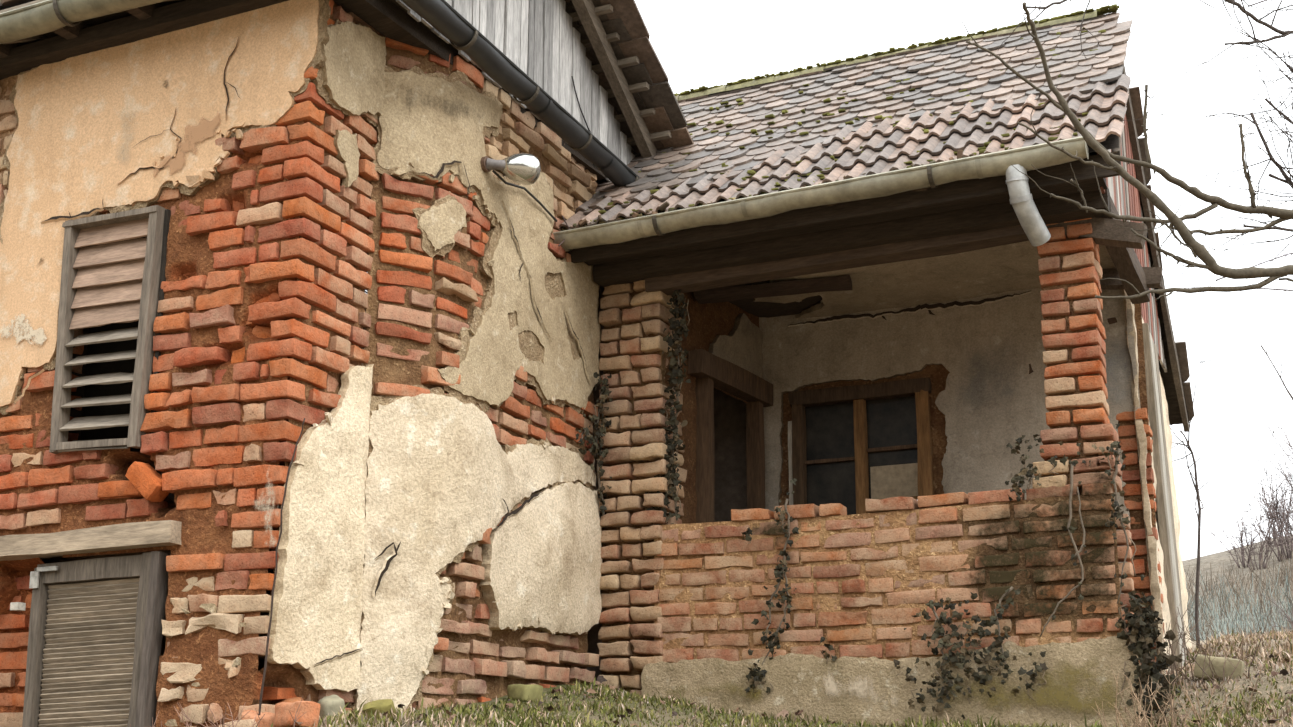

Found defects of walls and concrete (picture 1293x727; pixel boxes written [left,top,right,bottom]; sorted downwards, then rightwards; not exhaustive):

crack [222,37,241,115]
flaking render [327,0,598,262]
crack [788,291,1032,327]
flaking render [0,67,502,727]
flaking render [476,366,598,475]
crack [496,492,544,530]
flaking render [412,504,599,709]
efflorescence [825,674,875,698]